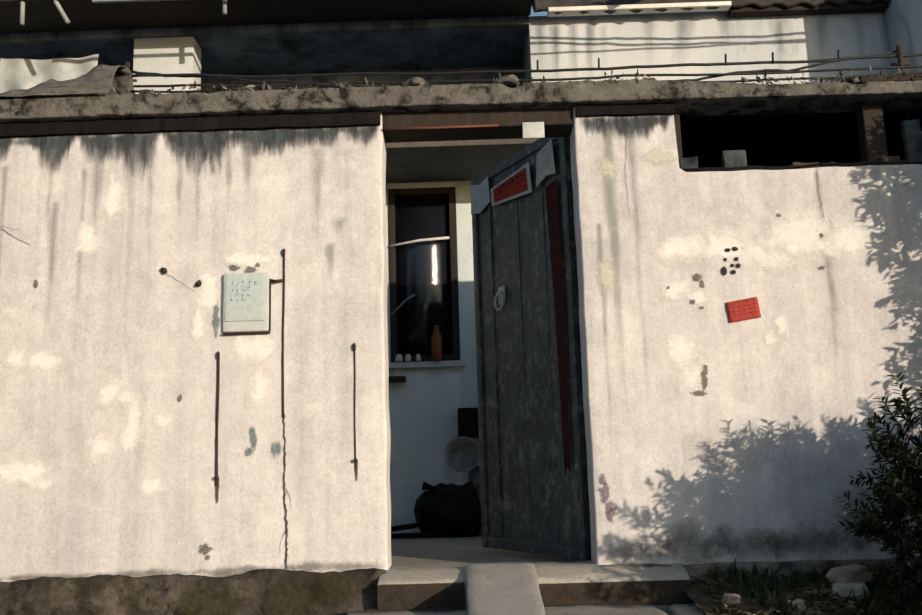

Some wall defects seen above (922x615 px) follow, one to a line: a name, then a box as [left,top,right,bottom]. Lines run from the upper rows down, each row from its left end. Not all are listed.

damp [0,126,377,168]
damp [583,115,668,161]
damp [607,174,617,246]
peeling [657,210,872,270]
peeling [662,273,707,309]
crack [280,413,292,569]